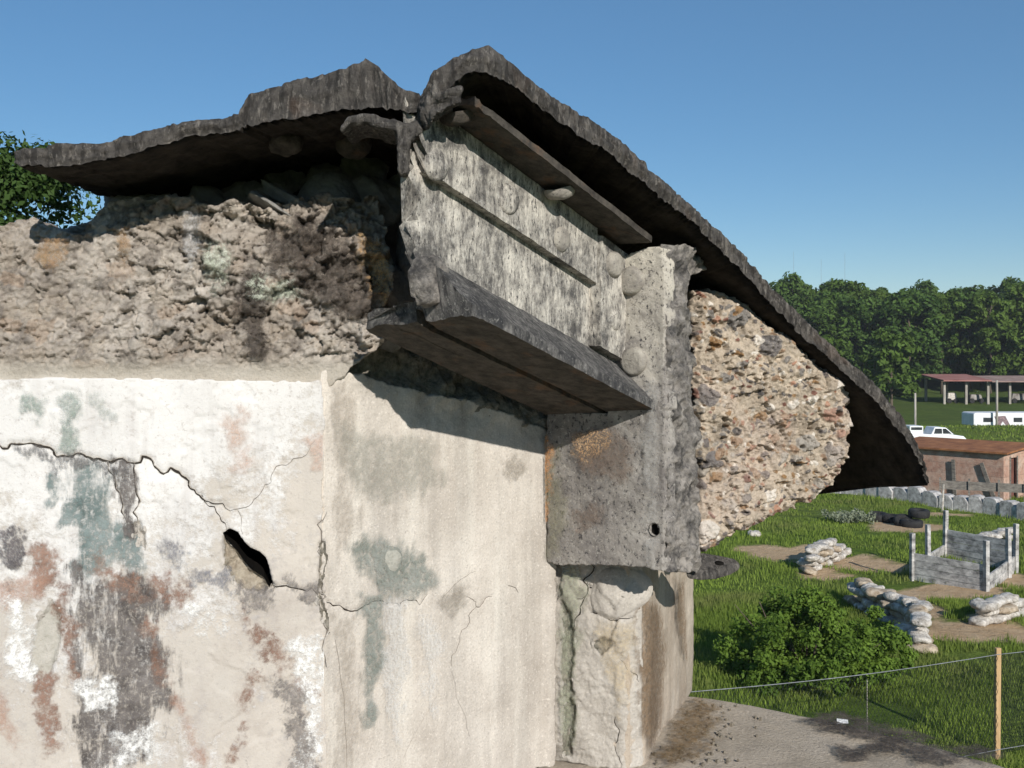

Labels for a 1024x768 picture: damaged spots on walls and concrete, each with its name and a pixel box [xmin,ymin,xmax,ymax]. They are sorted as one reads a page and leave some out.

crack [0,442,309,534]
corrosion [545,438,555,522]
corrosion [572,428,611,462]
spalling [687,288,853,552]
damp [0,525,26,570]
damp [15,393,180,768]
damp [191,566,232,589]
spalling [223,529,330,633]
damp [353,535,438,727]
peeling [274,675,319,768]